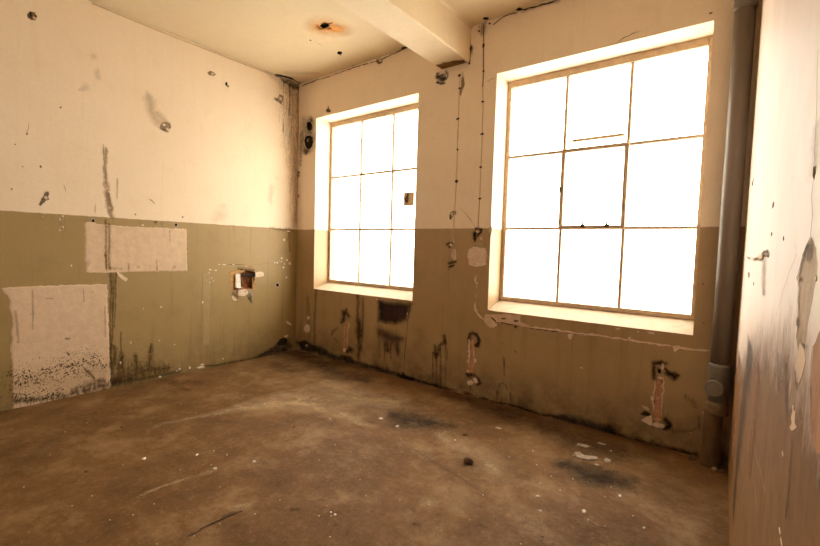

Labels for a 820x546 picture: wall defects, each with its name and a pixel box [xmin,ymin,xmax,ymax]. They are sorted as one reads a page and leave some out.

corrosion [316,22,341,31]
water stain [0,151,171,408]
water stain [206,289,451,442]
spalling [466,332,481,390]
spalling [641,360,679,430]
peeling [796,236,820,456]